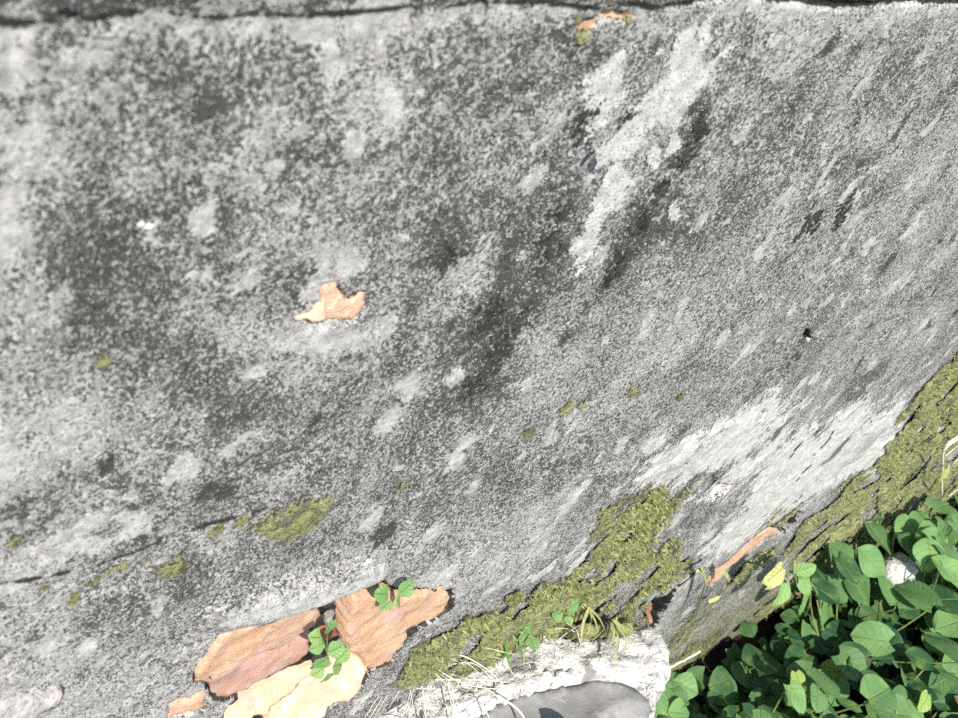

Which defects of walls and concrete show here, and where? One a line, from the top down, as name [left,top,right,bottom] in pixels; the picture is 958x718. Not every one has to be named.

crack [0,0,698,29]
crack [776,0,958,8]
crack [191,507,268,531]
crack [96,538,166,567]
crack [0,570,71,585]